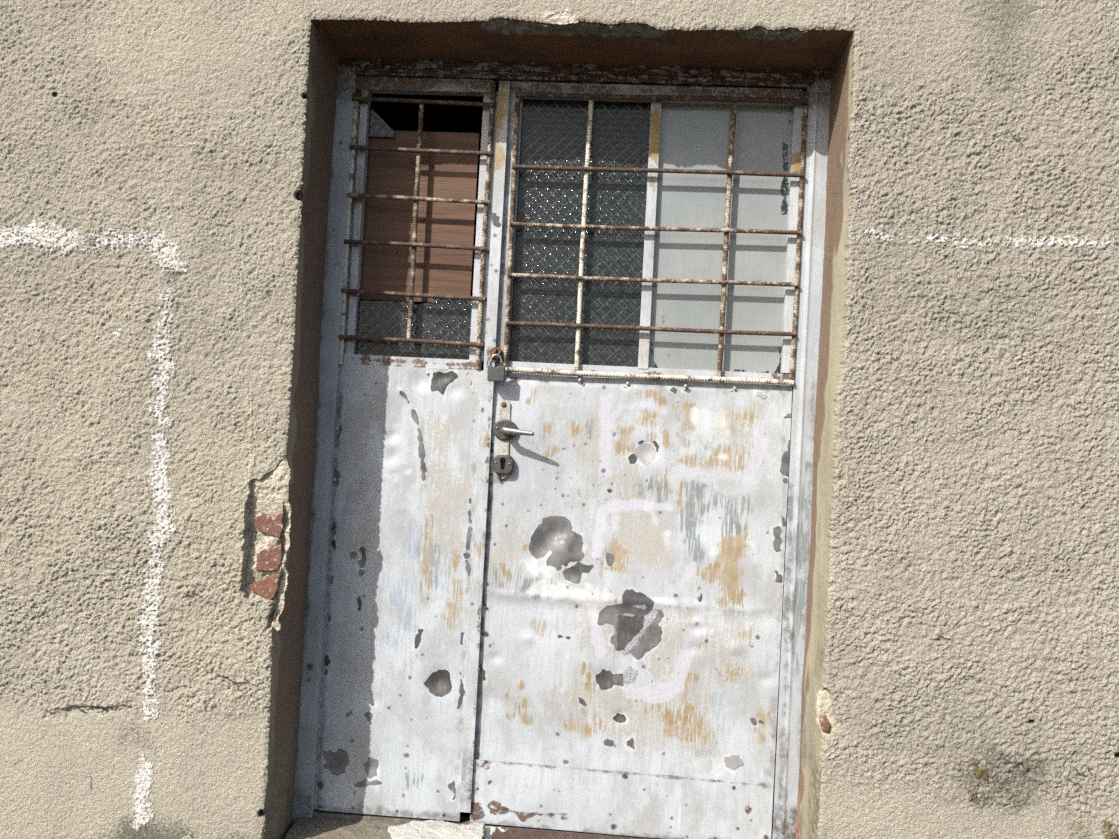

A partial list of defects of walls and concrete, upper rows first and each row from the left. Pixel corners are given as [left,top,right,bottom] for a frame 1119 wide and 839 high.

flaking render [245,459,292,631]